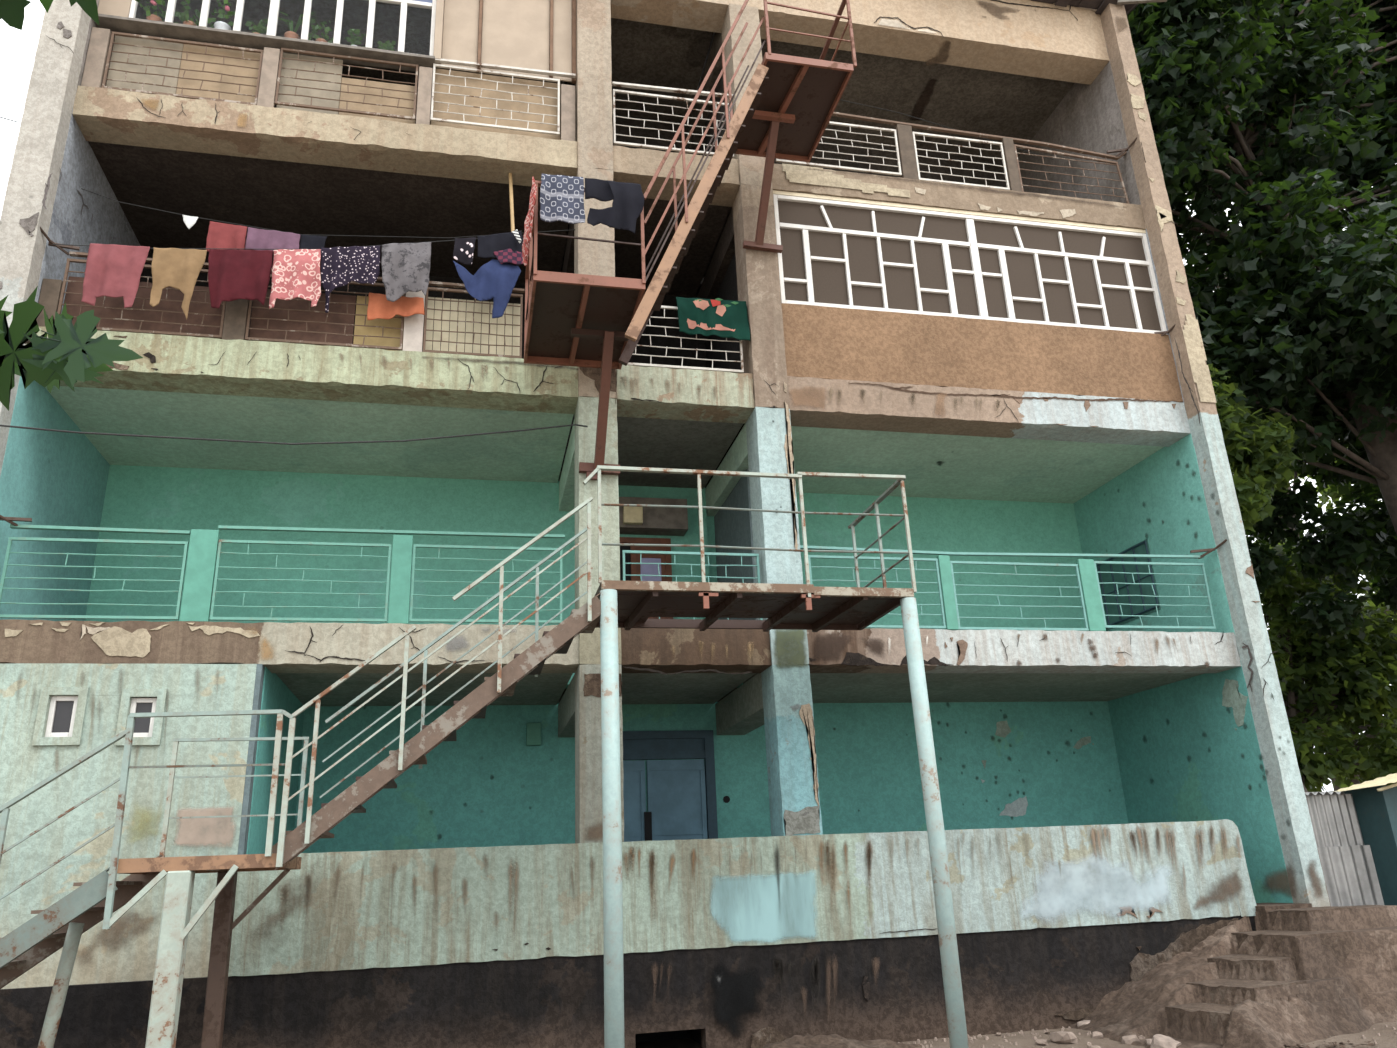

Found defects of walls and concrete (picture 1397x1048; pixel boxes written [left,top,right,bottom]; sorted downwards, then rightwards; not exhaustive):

peeling [5,622,72,637]
peeling [91,622,168,658]
peeling [186,622,260,638]
crack [288,625,365,662]
peeling [775,629,816,667]
spalling [841,652,907,666]
peeling [924,637,968,666]
peeling [1222,679,1248,730]
flaking render [783,703,821,836]
corrosion [624,848,675,899]
corrosion [820,842,850,908]
leakage [802,958,837,1008]